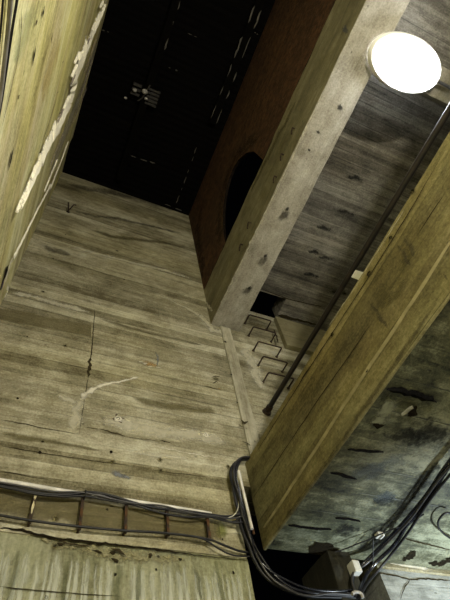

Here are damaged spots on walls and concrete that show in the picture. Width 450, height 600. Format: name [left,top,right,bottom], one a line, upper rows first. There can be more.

peeling [0,1,106,298]
crack [3,312,170,443]
damp [61,377,138,428]
spalling [41,538,184,565]